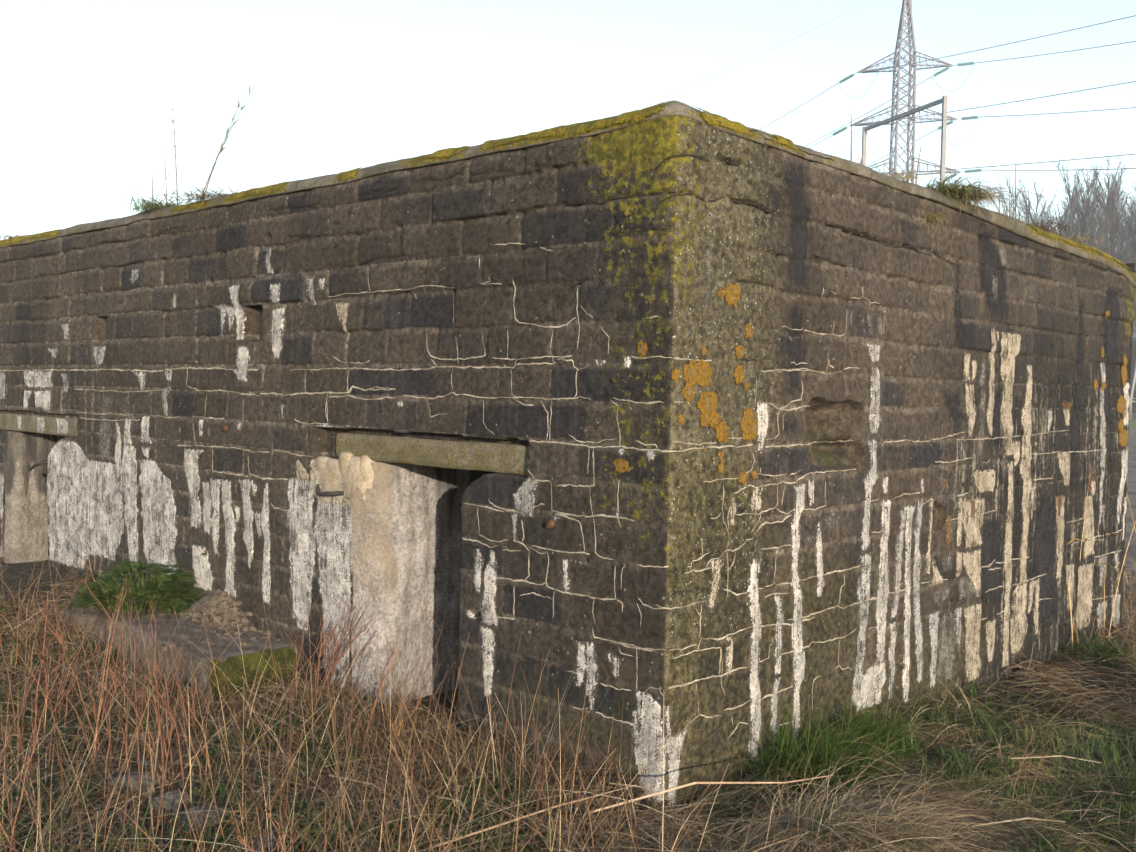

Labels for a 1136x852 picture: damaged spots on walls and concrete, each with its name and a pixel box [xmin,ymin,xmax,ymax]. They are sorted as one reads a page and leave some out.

crack [749,130,834,161]
water stain [17,324,178,576]
water stain [184,449,271,604]
water stain [287,460,352,689]
crack [0,243,947,737]
water stain [466,549,498,697]
water stain [747,479,842,761]
crack [863,492,995,520]
water stain [851,225,1130,711]
crack [882,430,1107,480]
crack [981,557,1052,620]
crack [1066,518,1122,557]